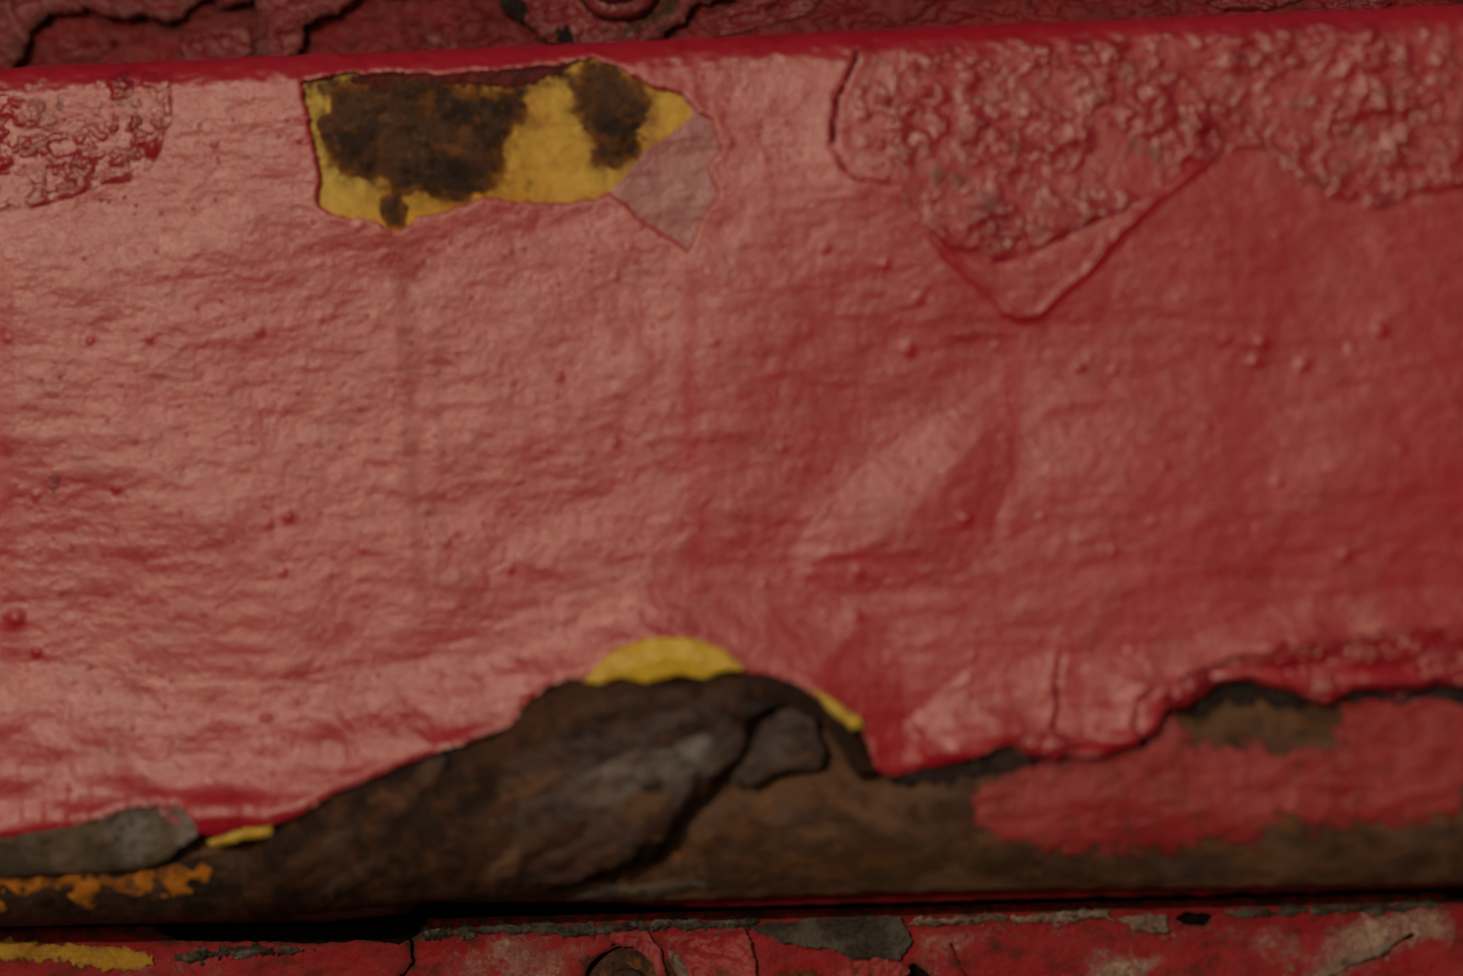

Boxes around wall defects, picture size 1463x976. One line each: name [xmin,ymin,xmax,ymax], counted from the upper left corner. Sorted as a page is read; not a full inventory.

spalling [17,0,259,68]
spalling [663,0,1463,40]
peeling [299,0,721,250]
spalling [1165,626,1463,711]
spalling [1020,728,1078,760]
corrosion [0,637,1463,927]
crack [400,927,419,976]
peeling [608,907,1169,976]
water stain [1283,899,1453,976]